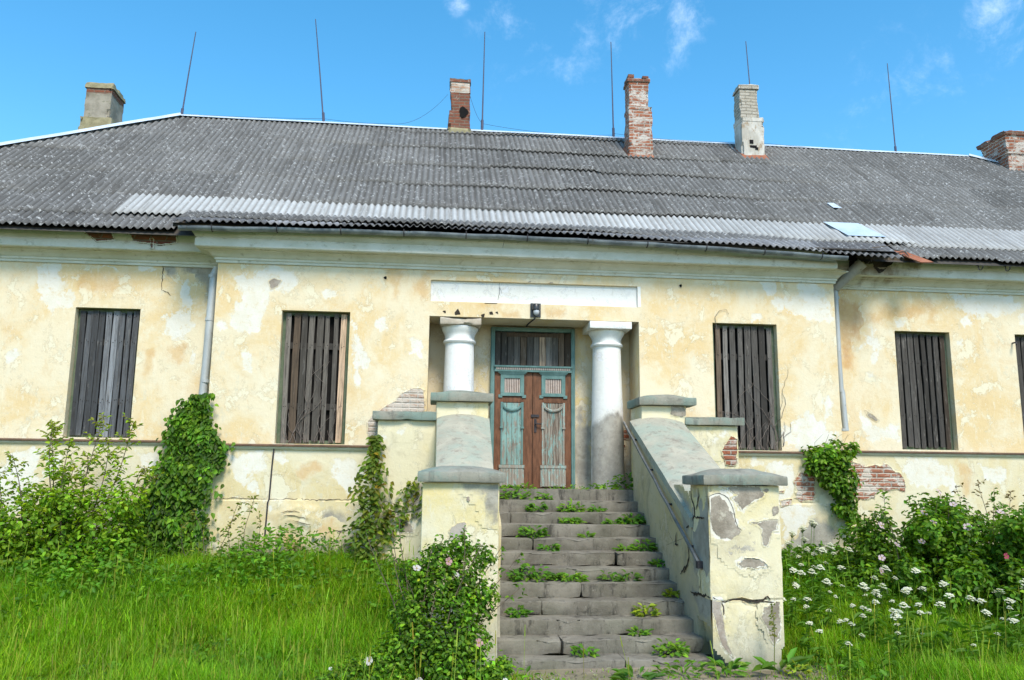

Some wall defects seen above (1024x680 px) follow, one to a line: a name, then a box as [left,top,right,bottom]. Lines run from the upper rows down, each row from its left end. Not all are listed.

spalling [73,231,178,249]
spalling [366,387,426,449]
peeling [706,390,960,579]
peeling [977,460,1012,490]
crack [667,488,777,615]